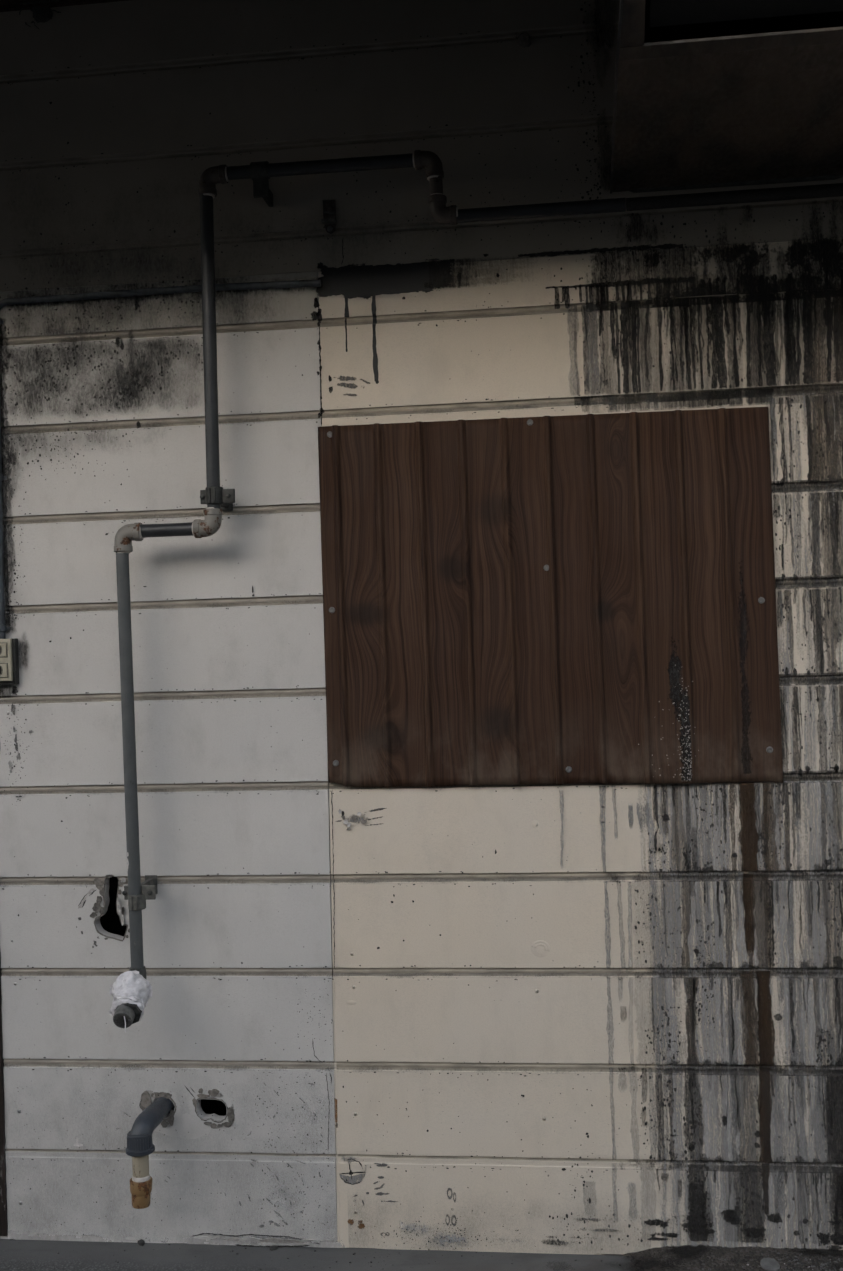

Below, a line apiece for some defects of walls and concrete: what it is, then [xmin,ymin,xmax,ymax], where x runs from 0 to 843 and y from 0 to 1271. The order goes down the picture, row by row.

mould [0,246,203,510]
leakage [518,200,843,1250]
hole [76,874,130,948]
hole [139,1090,177,1128]
hole [184,1085,235,1128]